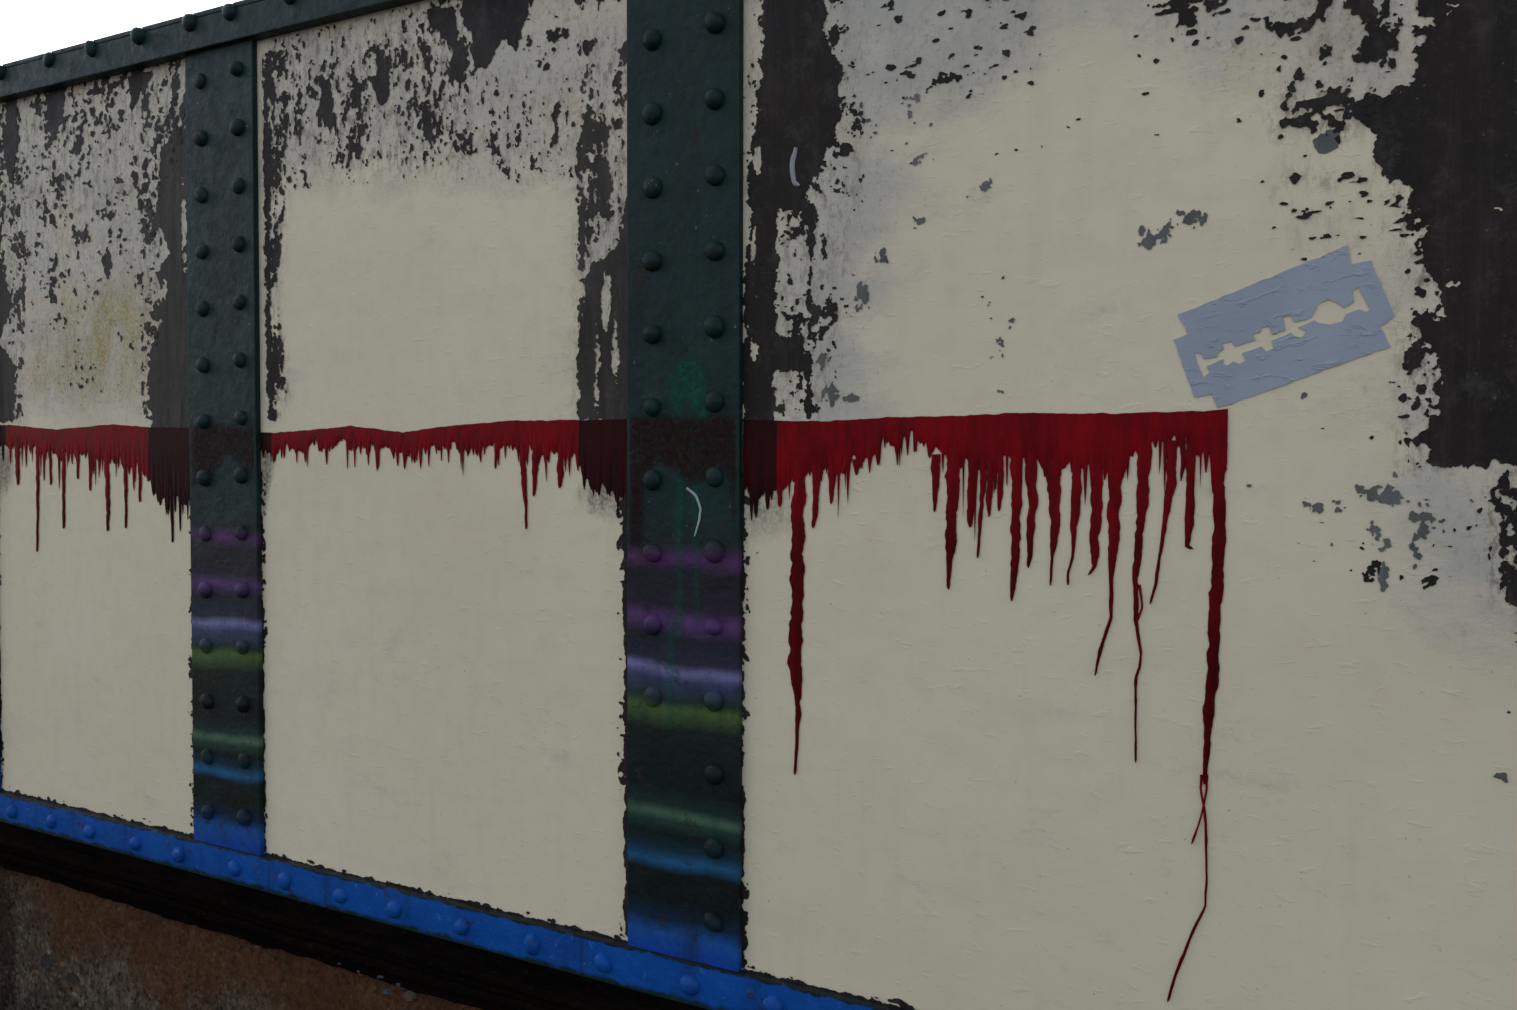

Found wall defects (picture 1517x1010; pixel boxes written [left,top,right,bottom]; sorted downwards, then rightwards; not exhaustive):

peeling [1147,0,1231,46]
peeling [0,60,189,428]
peeling [743,0,1041,420]
peeling [1138,209,1208,250]
peeling [1234,0,1517,607]